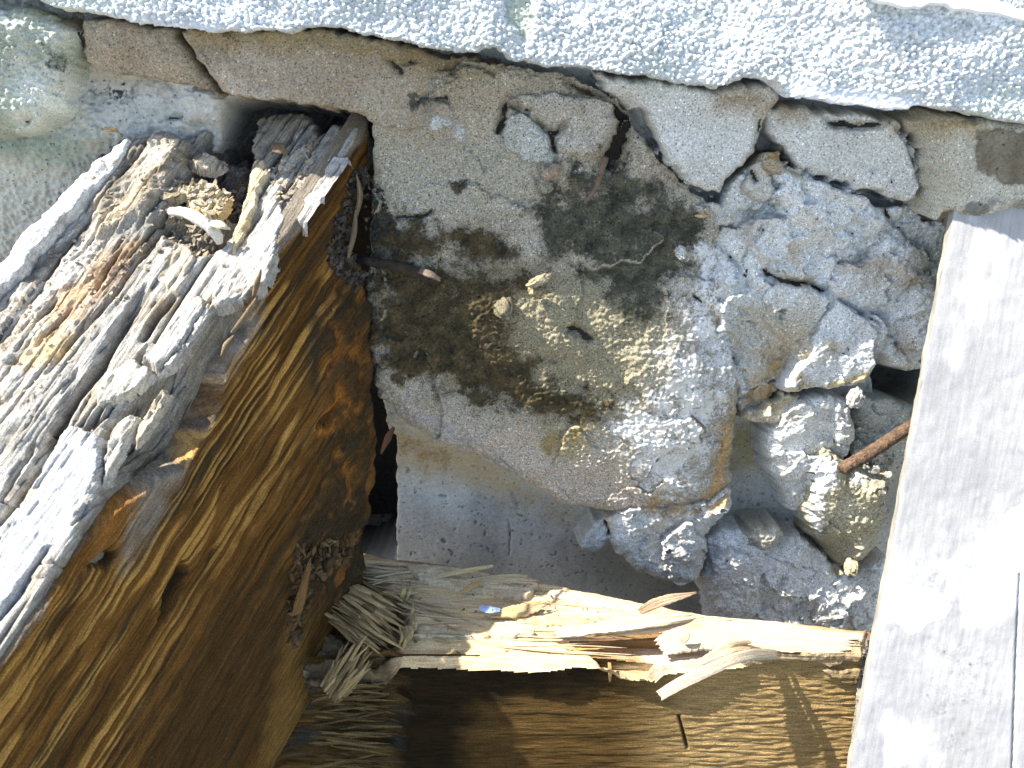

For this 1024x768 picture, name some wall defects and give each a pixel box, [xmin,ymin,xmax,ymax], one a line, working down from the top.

crack [390,60,414,74]
crack [497,103,528,134]
crack [548,130,559,152]
crack [570,84,631,169]
crack [828,120,881,129]
crack [396,210,432,219]
spalling [696,165,946,411]
leakage [367,144,751,511]
peeling [573,507,610,552]